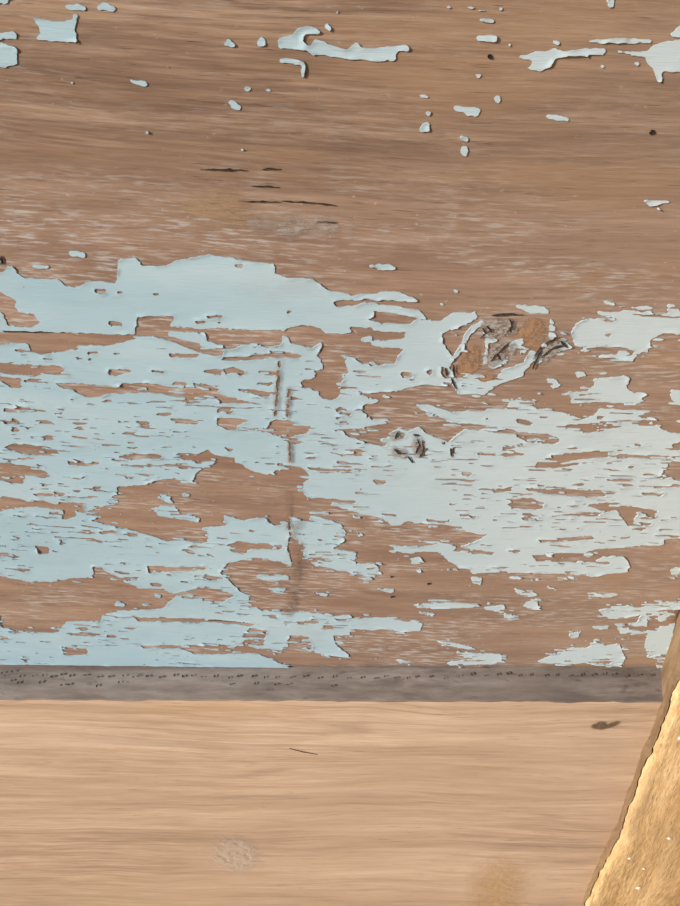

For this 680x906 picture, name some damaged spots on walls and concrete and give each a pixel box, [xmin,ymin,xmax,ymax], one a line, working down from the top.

peeling [33,3,86,42]
peeling [97,2,116,12]
peeling [0,31,18,68]
peeling [278,24,409,77]
peeling [520,26,680,82]
peeling [454,106,480,117]
peeling [644,200,669,210]
crack [481,313,523,362]
crack [533,337,568,369]
crack [445,365,457,389]
peeling [0,254,680,668]